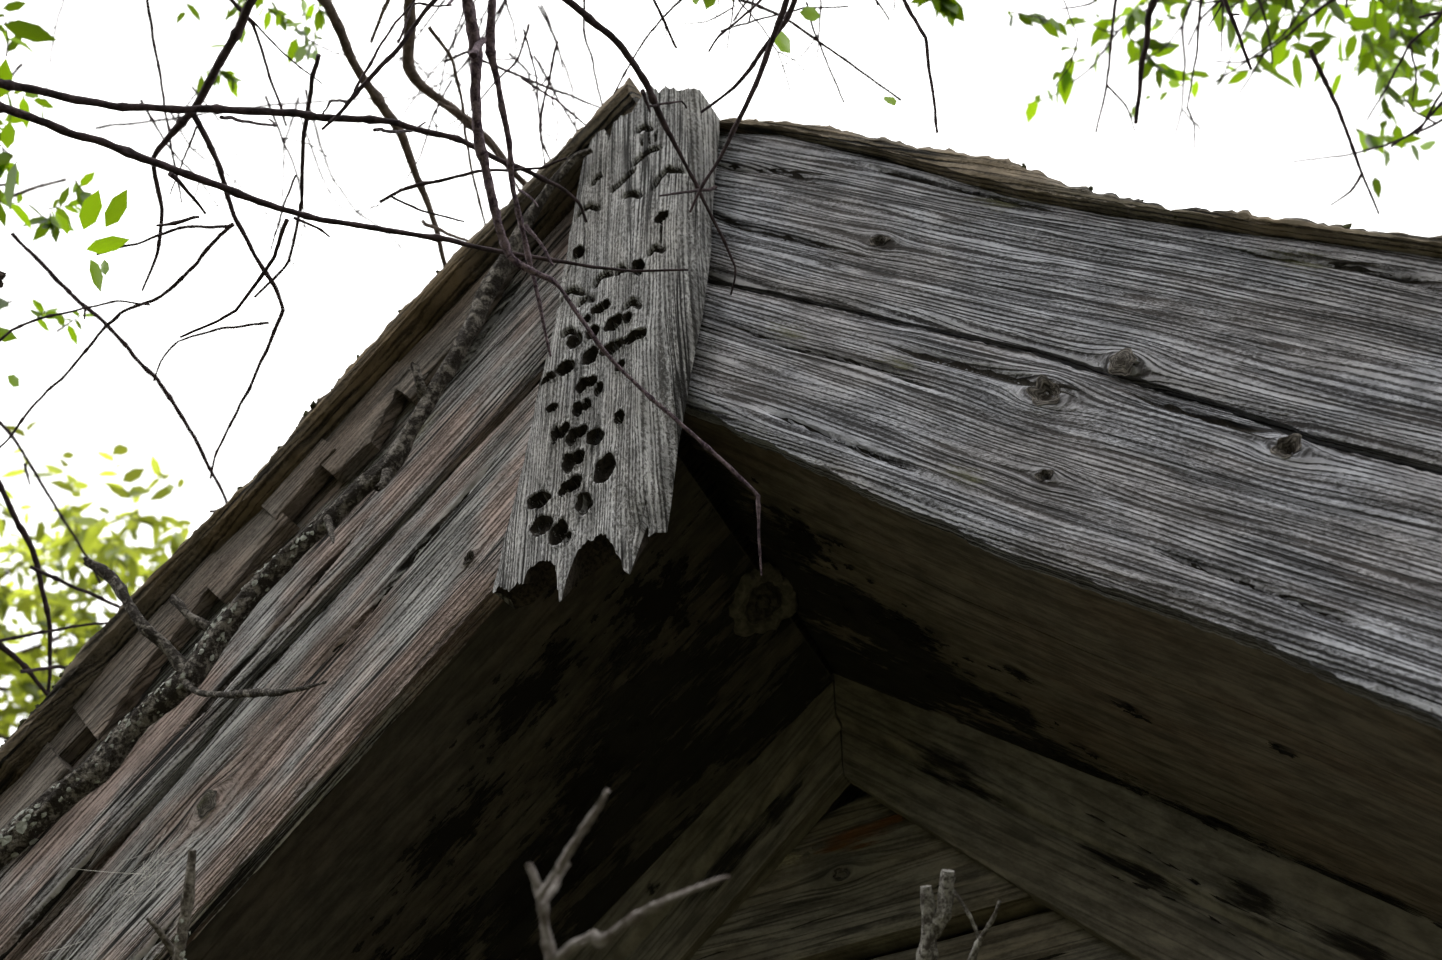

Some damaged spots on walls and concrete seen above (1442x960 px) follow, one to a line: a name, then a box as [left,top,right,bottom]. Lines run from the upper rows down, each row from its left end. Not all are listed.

damp [697,780,802,894]